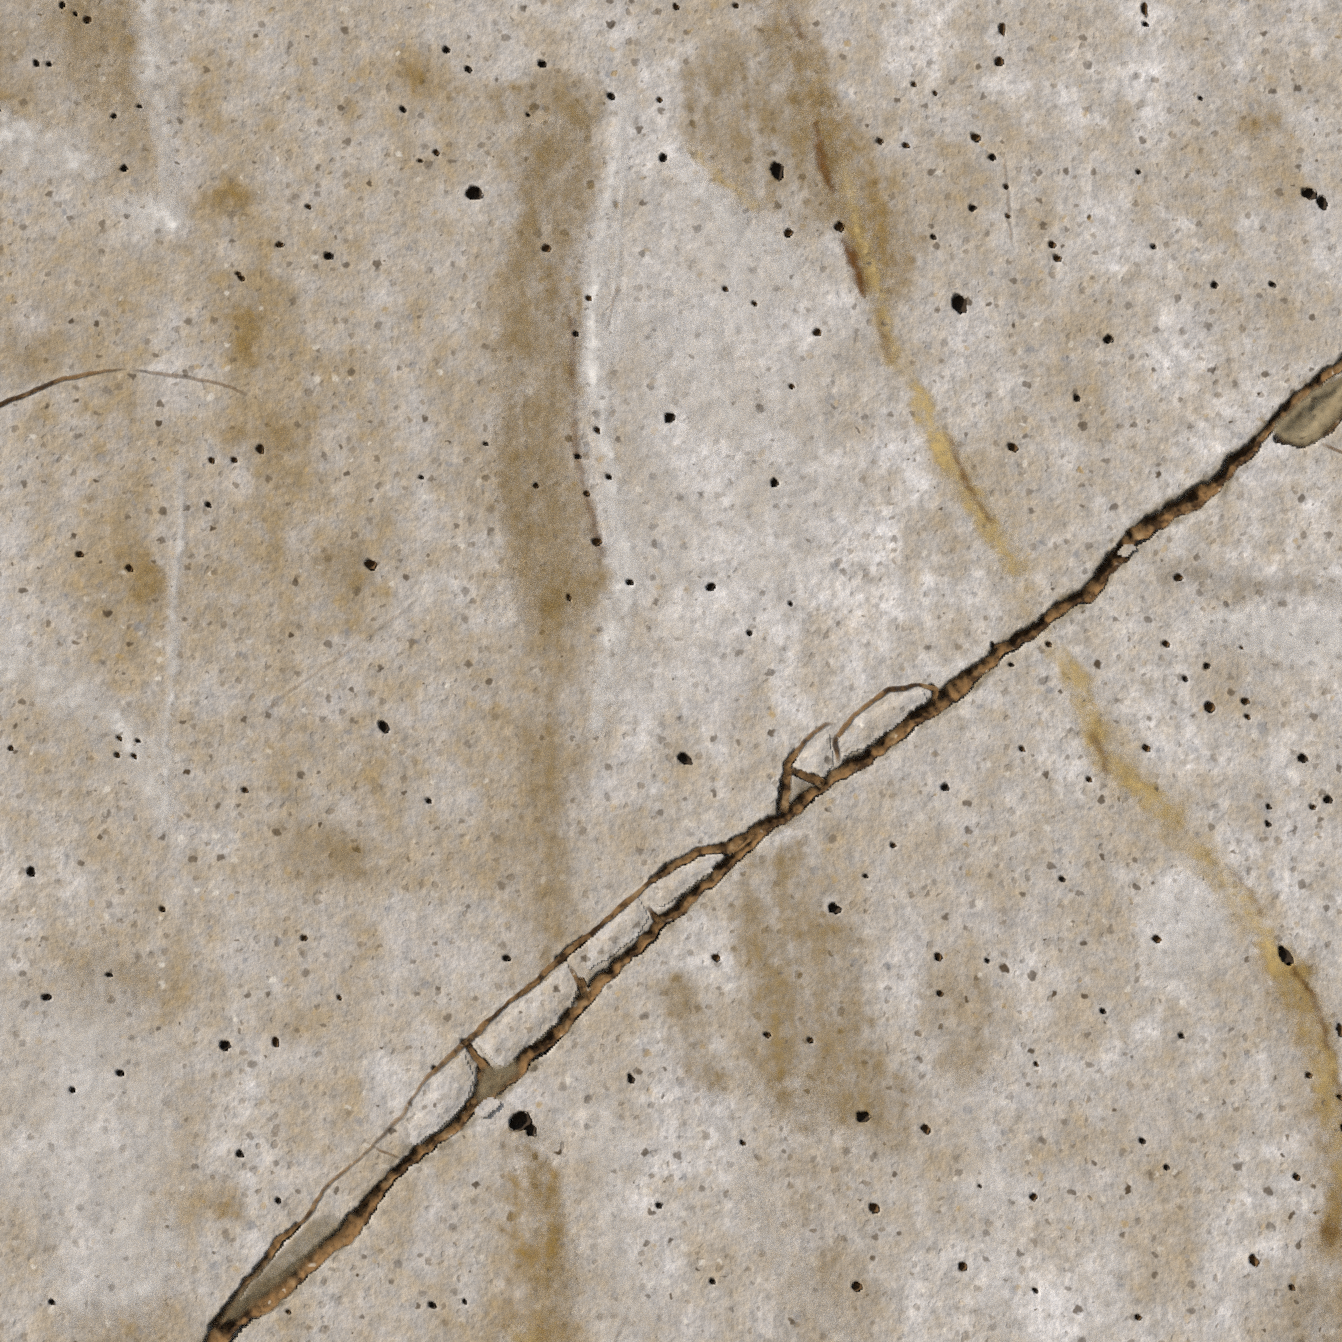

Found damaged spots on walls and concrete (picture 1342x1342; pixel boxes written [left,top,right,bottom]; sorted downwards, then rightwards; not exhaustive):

corrosion [817,142,831,187]
corrosion [843,181,897,365]
crack [0,369,117,407]
damp [544,98,639,730]
corrosion [910,382,1016,573]
corrosion [1059,660,1178,819]
crack [203,359,1342,1342]
corrosion [1232,892,1312,1012]
corrosion [1300,1027,1339,1124]